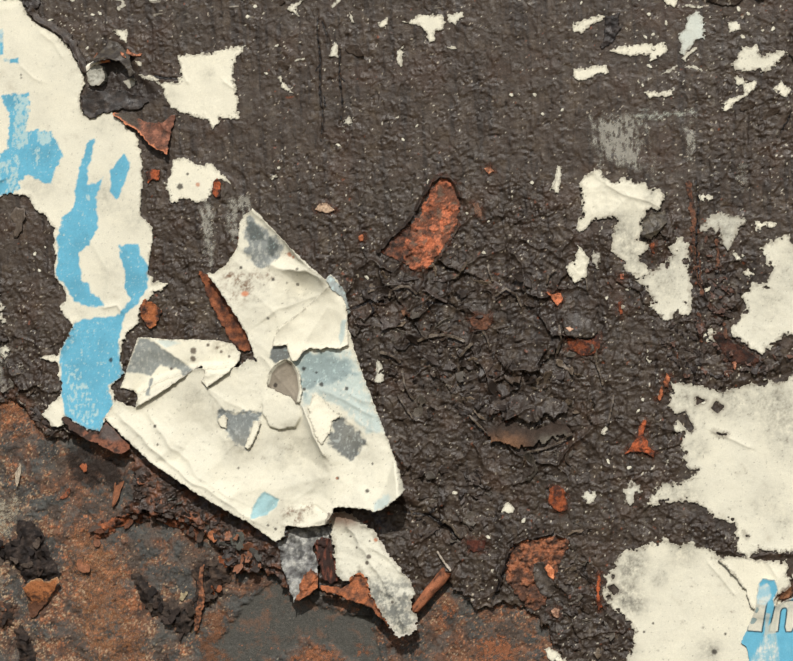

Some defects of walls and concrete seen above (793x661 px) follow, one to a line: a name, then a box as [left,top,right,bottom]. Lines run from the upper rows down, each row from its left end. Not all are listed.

peeling [21,0,41,9]
peeling [89,41,136,77]
corrosion [376,173,461,272]
crack [346,299,386,316]
crack [408,301,465,313]
peeling [659,234,793,385]
corrosion [0,601,37,661]
corrosion [0,498,62,618]
corrosion [131,556,232,661]
peeling [130,471,281,574]
crack [404,506,460,541]
corrosion [494,529,570,618]